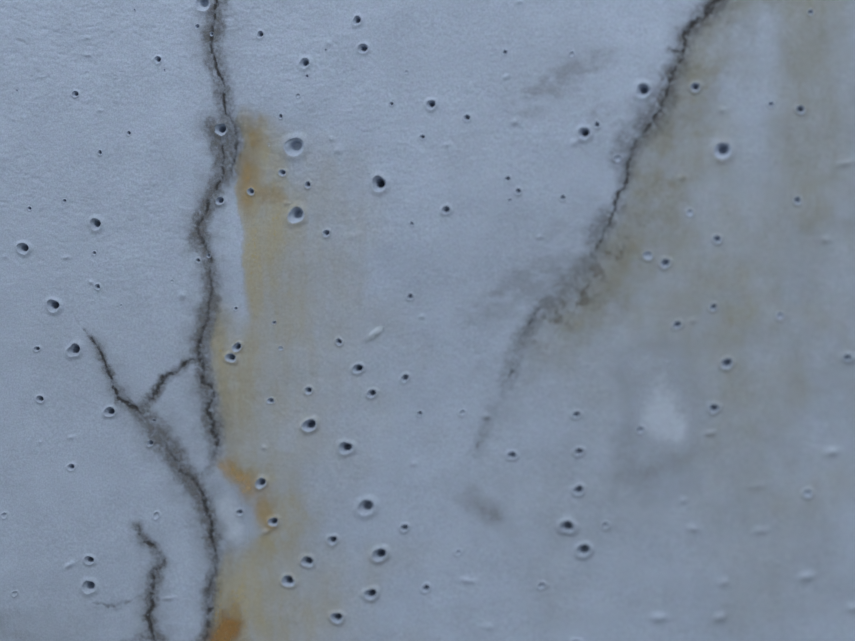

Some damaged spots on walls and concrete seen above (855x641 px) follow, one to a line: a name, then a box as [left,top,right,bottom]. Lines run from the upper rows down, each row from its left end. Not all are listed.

crack [592,0,725,255]
crack [92,0,240,641]
rust [209,583,248,641]